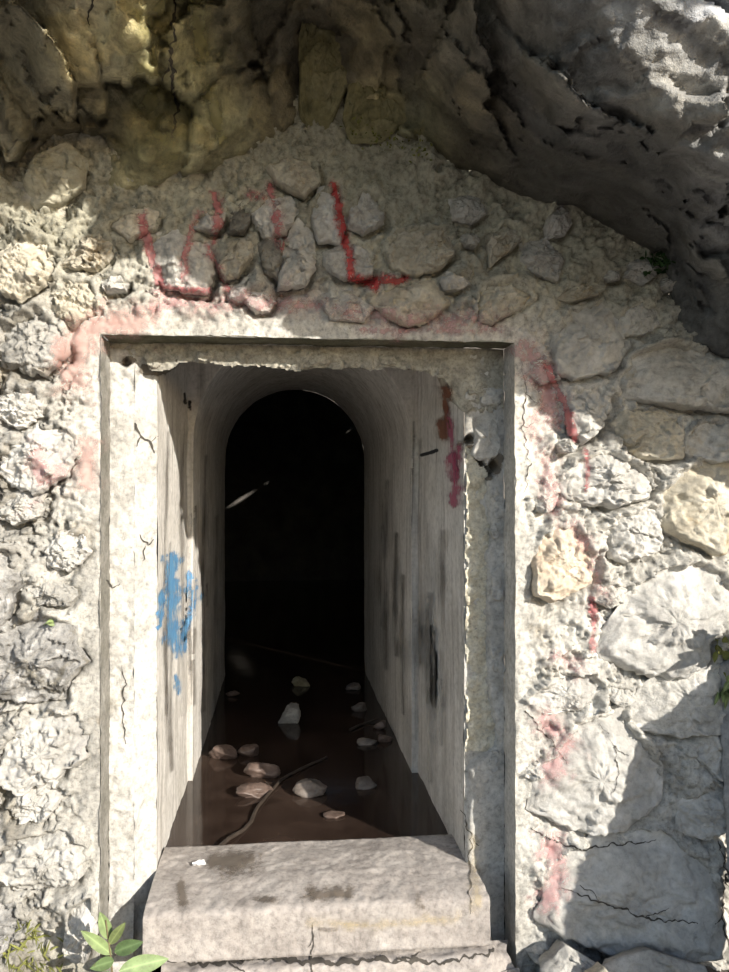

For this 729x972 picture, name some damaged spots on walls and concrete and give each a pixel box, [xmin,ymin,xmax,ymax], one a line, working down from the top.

crack [162,0,181,138]
crack [134,423,156,453]
crack [531,828,655,851]
crack [559,841,729,942]
crack [167,923,494,972]